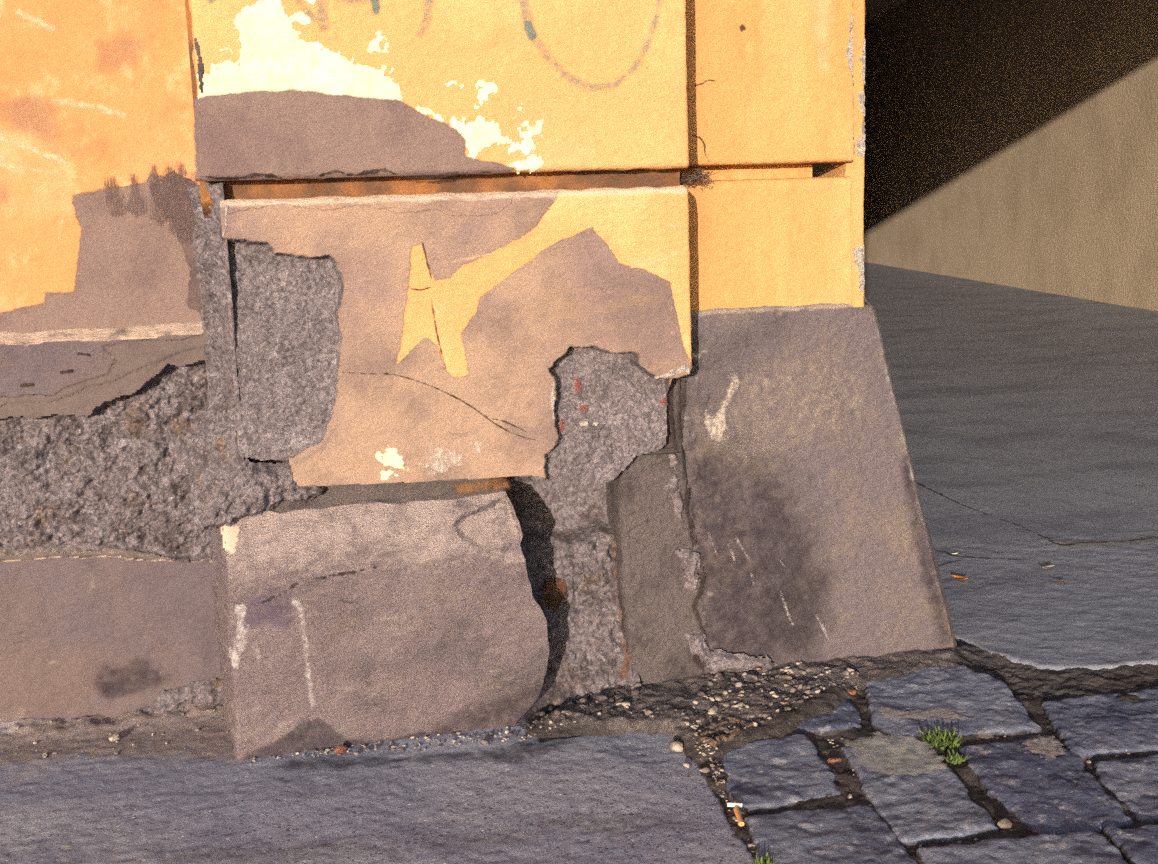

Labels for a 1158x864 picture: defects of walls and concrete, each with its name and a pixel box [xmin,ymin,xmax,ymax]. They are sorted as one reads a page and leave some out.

peeling [194,0,544,174]
spalling [319,168,490,179]
spalling [0,173,512,562]
crack [342,243,535,440]
spalling [544,345,690,484]